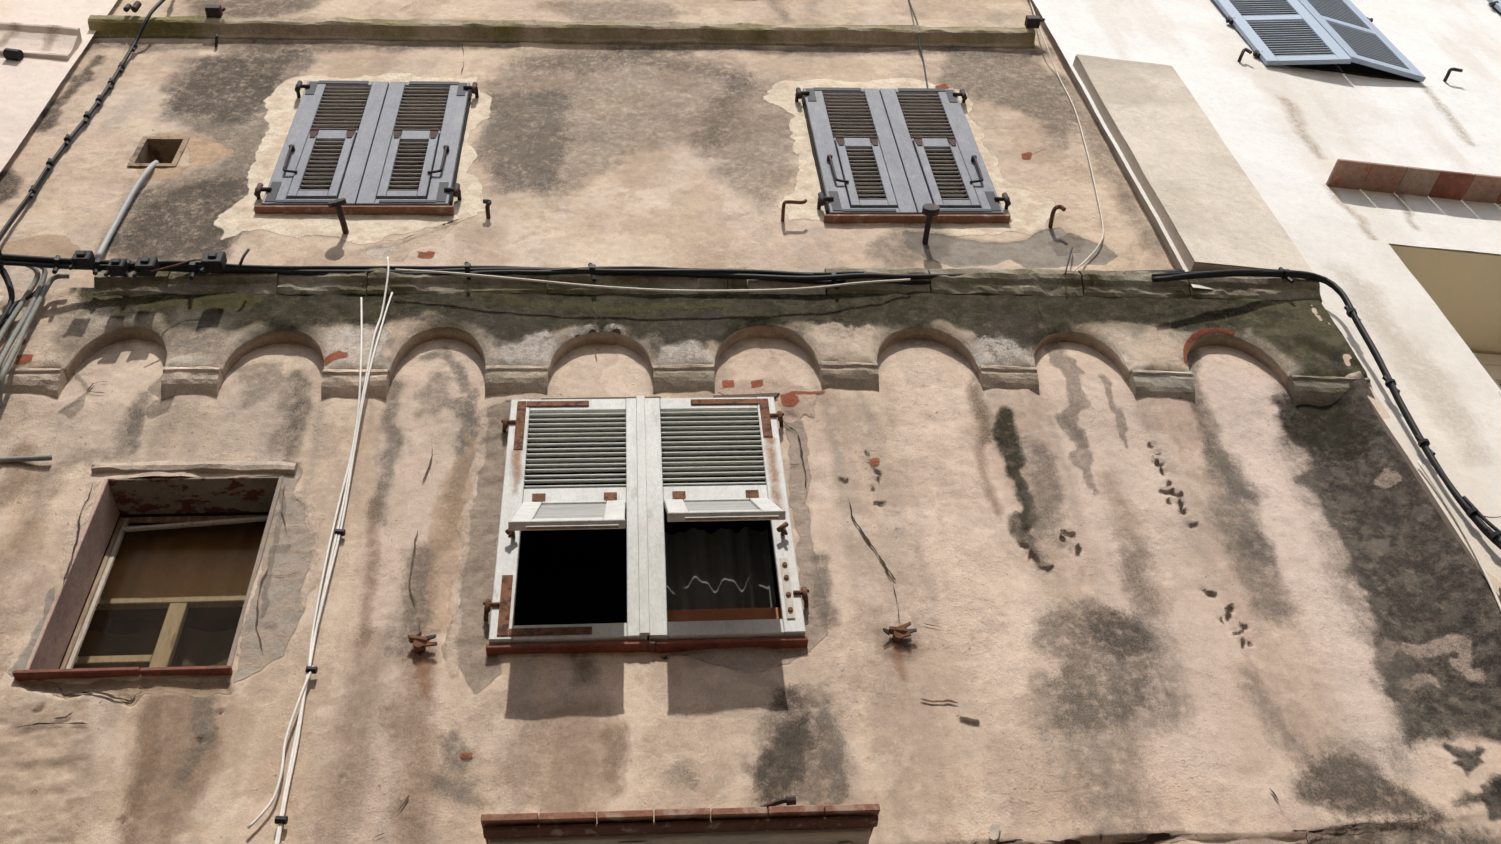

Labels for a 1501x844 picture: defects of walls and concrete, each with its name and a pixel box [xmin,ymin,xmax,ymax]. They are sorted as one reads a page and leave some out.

leakage [107,45,313,261]
leakage [478,92,566,190]
spalling [359,222,458,264]
spalling [570,324,622,337]
leakage [974,310,1096,491]
leakage [1008,446,1062,566]
spalling [7,460,323,711]
leakage [1273,336,1501,844]
leakage [754,692,845,805]
crack [973,836,1081,844]
crack [1117,833,1189,844]
crack [1269,788,1450,844]